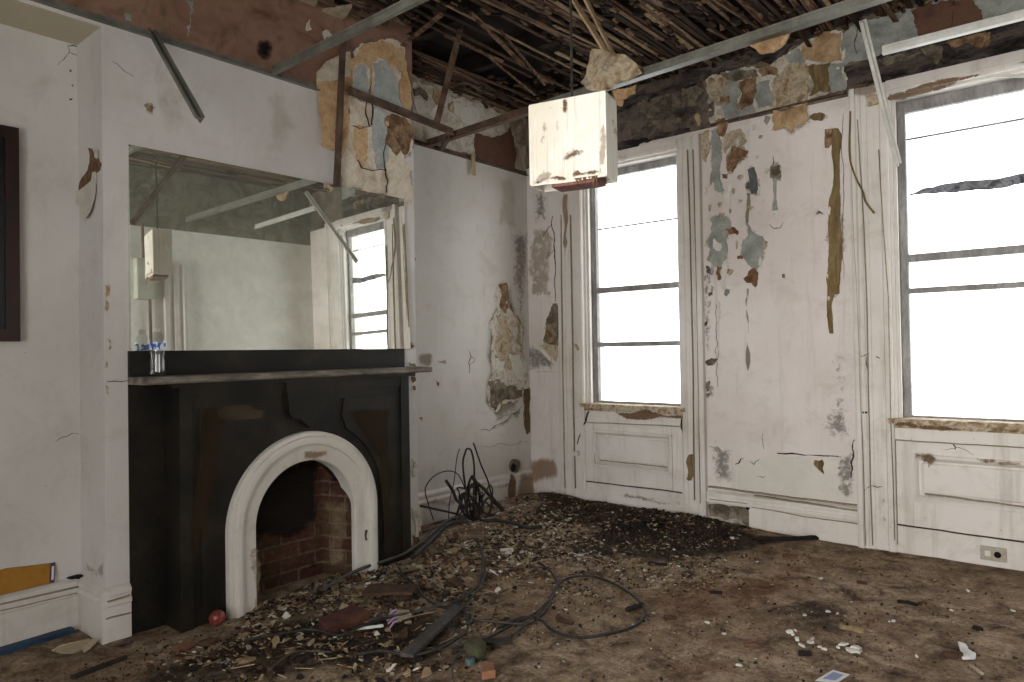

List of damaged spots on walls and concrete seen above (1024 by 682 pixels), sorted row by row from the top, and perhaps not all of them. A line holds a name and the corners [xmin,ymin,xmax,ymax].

flaking render [316,38,517,205]
flaking render [682,0,1024,398]
flaking render [486,282,528,415]
flaking render [535,303,559,362]